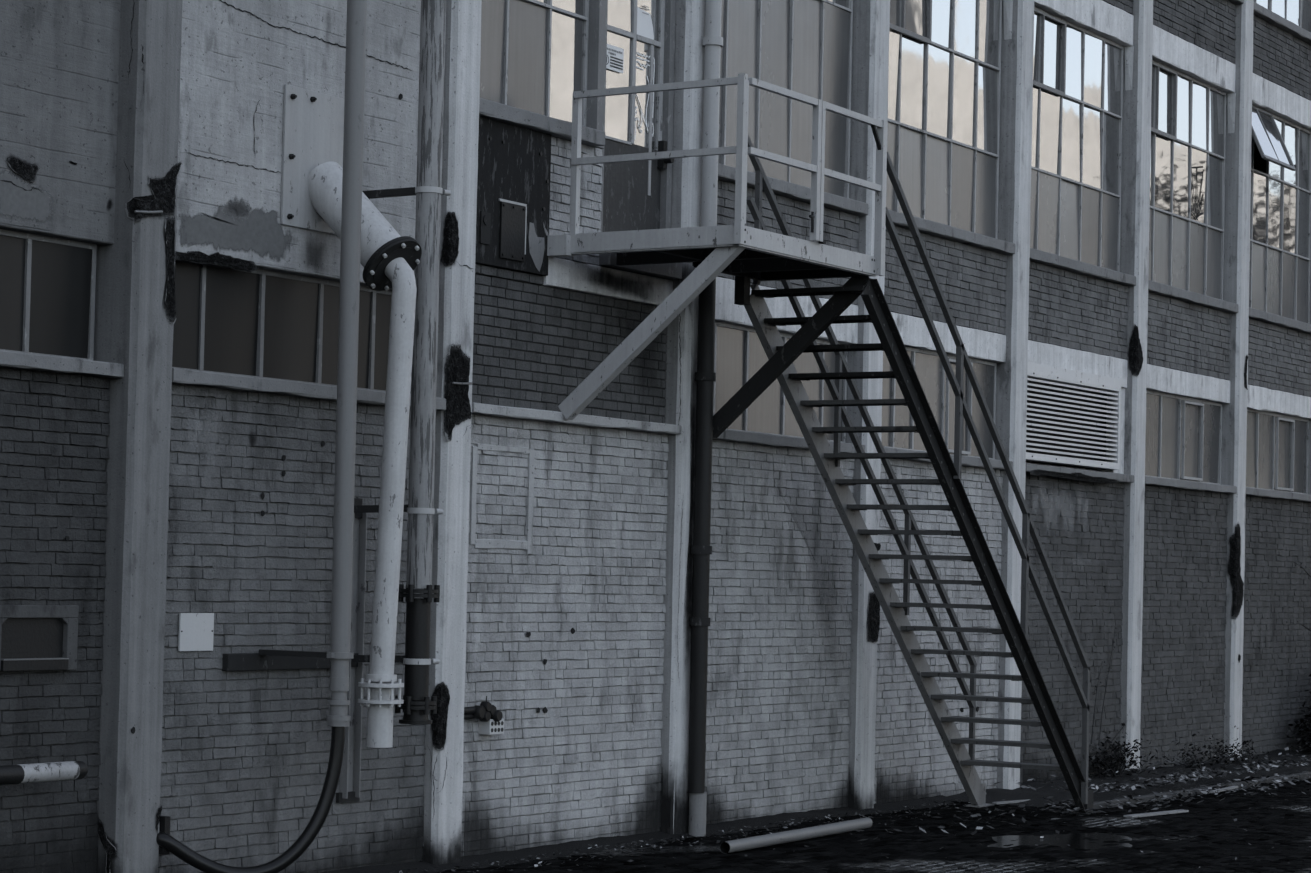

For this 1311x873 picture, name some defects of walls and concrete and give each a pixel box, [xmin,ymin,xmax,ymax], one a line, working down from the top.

crack [220,0,412,71]
spalling [6,156,40,182]
spalling [125,163,258,325]
spalling [440,212,459,266]
spalling [1128,324,1143,376]
spalling [443,344,472,442]
spalling [1227,521,1244,619]
spalling [867,591,880,644]
spalling [430,682,450,751]